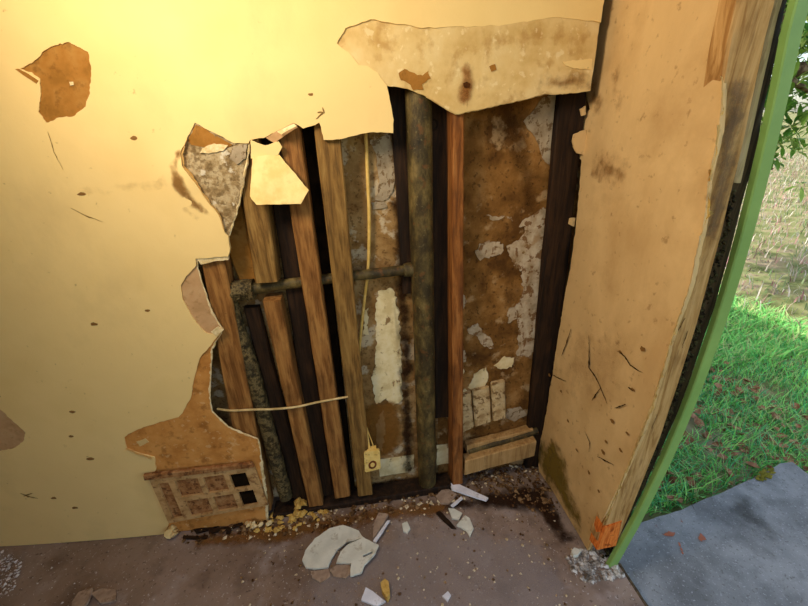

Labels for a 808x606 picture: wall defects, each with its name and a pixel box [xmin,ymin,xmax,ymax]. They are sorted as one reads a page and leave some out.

peeling [16,42,91,122]
spalling [334,17,600,488]
peeling [0,410,25,451]
peeling [125,258,279,532]
damp [197,442,580,547]